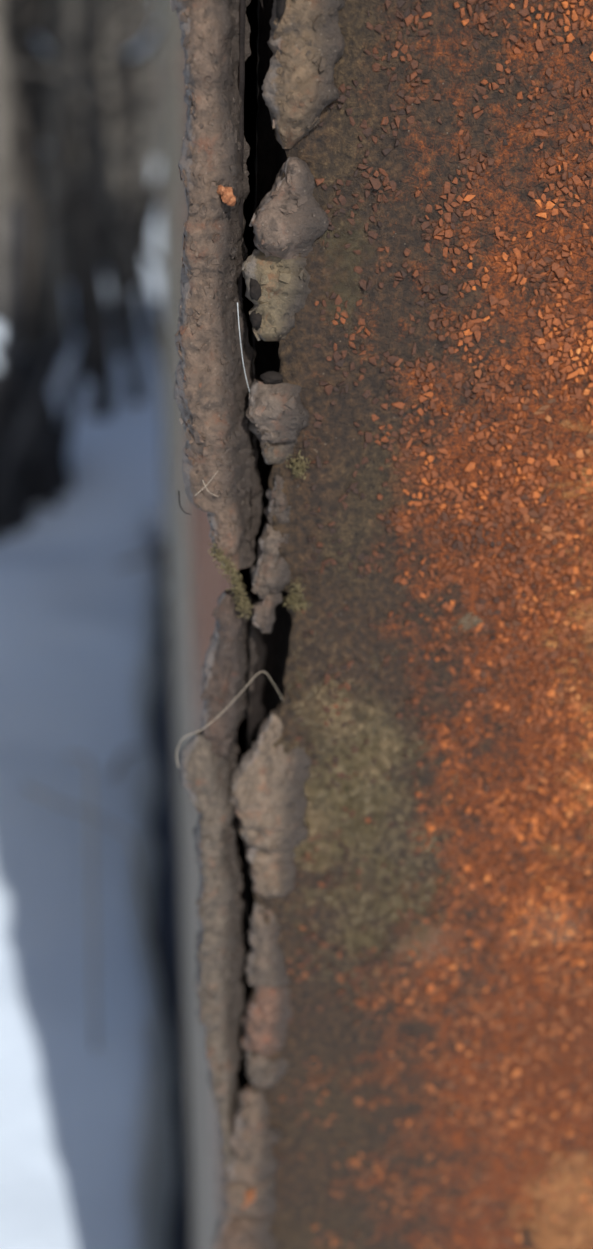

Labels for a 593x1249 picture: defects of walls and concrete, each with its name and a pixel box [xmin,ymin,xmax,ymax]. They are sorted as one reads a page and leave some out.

crack [253,0,287,249]
crack [251,303,280,380]
crack [245,436,292,753]
corrosion [287,0,593,1028]
crack [240,844,255,1088]